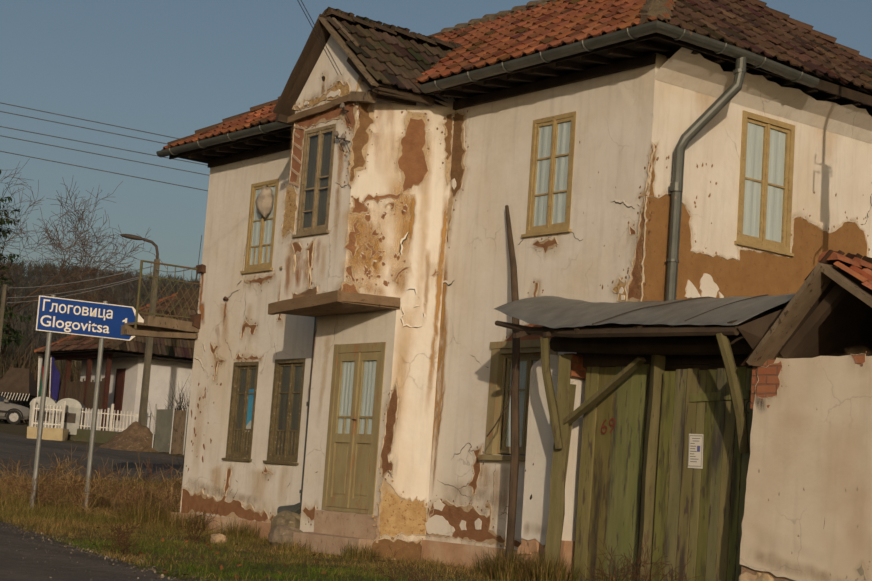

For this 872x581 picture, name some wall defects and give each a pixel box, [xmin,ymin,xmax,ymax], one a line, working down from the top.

spalling [281,75,469,298]
spalling [533,234,558,253]
spalling [600,143,870,302]
spalling [191,342,225,462]
spalling [240,318,258,339]
flaking render [752,361,789,408]
spalling [180,467,276,523]
spalling [370,378,521,562]